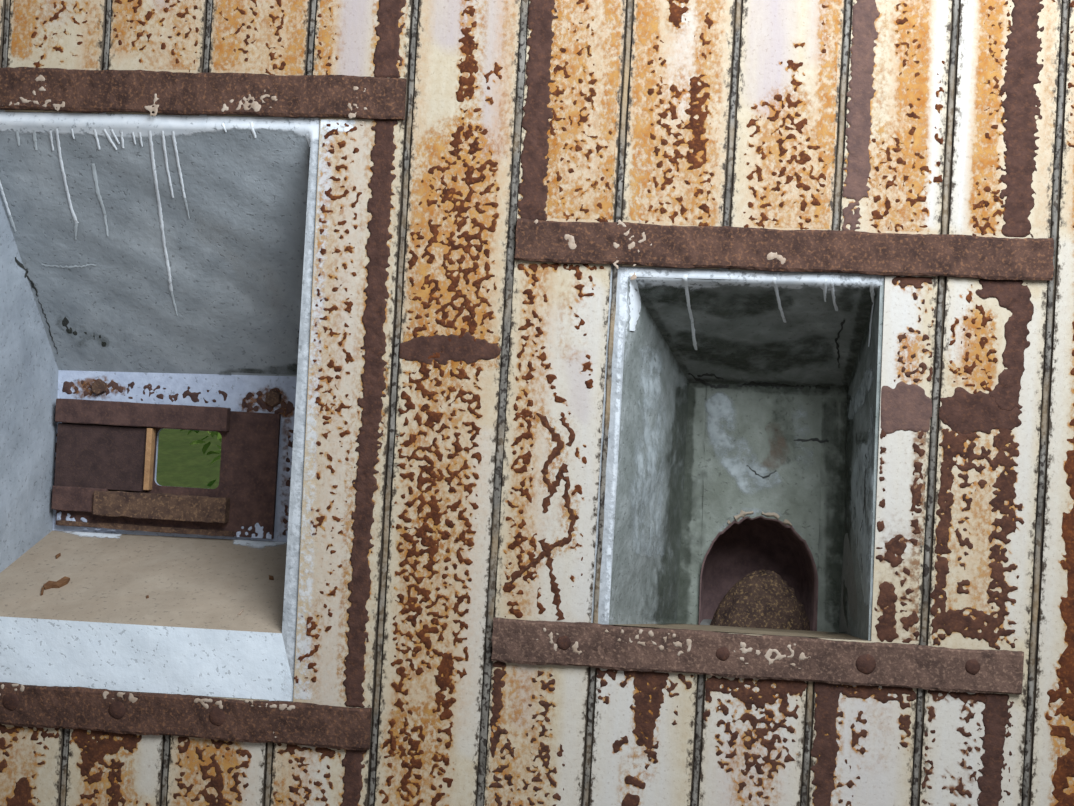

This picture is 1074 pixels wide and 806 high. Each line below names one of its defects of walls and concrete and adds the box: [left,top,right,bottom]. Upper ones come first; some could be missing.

leakage [0,182,16,232]
leakage [33,129,79,239]
leakage [92,129,190,316]
corrosion [294,120,398,708]
corrosion [379,0,503,806]
leakage [632,347,780,625]
leakage [629,273,828,371]
corrosion [743,0,945,234]
corrosion [874,276,1034,650]
corrosion [969,0,1056,238]
corrosion [1045,389,1074,806]
corrosion [596,668,1014,806]